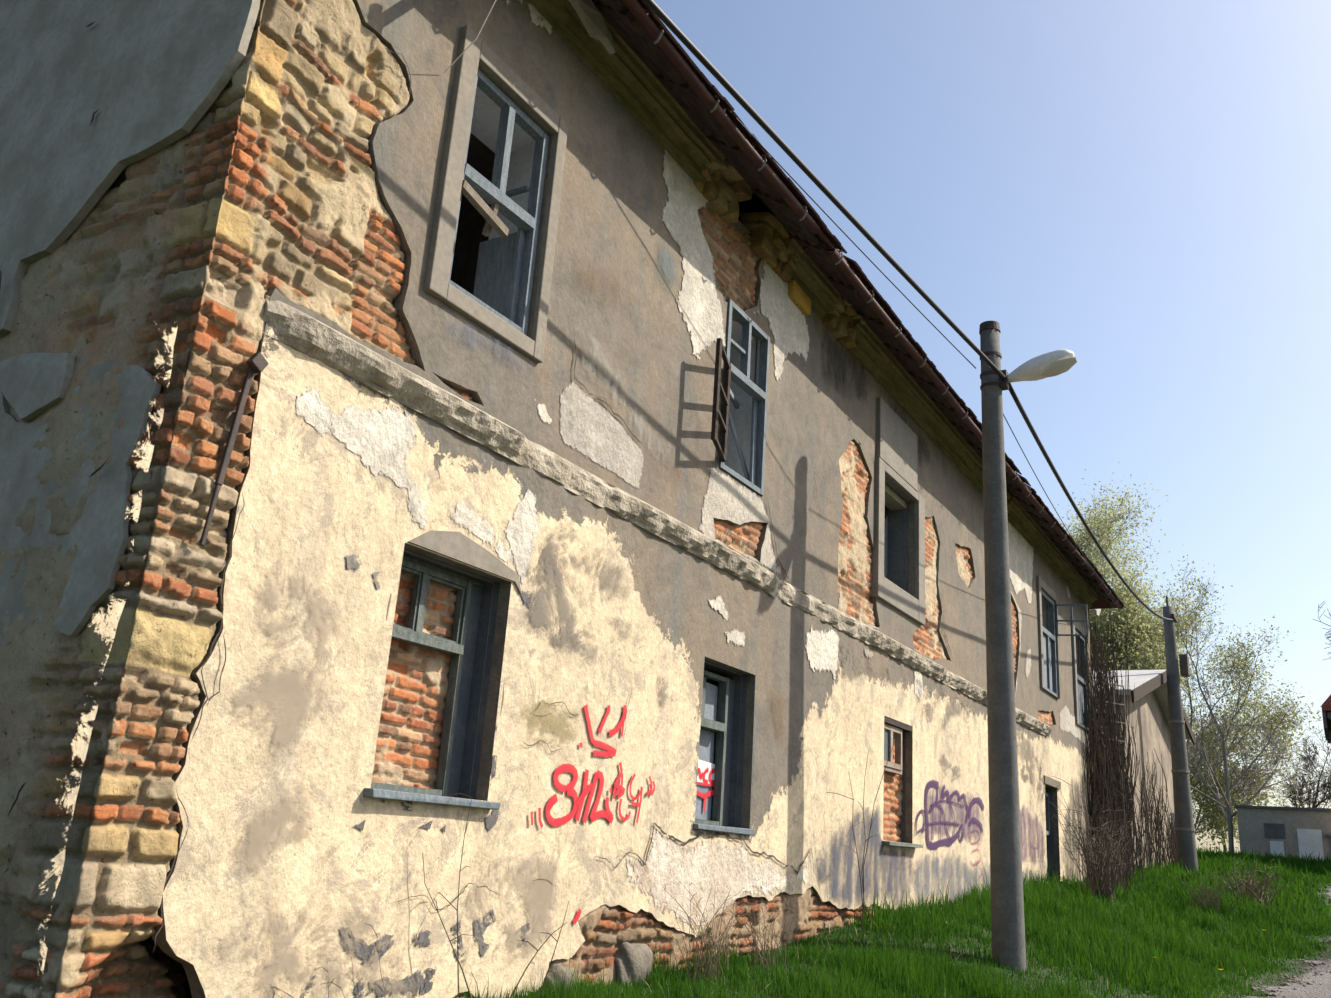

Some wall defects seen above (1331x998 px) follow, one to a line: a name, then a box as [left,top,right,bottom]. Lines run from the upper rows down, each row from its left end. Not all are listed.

crack [154,470,249,948]
peeling [0,0,990,998]
crack [597,823,814,875]
peeling [1016,704,1098,885]